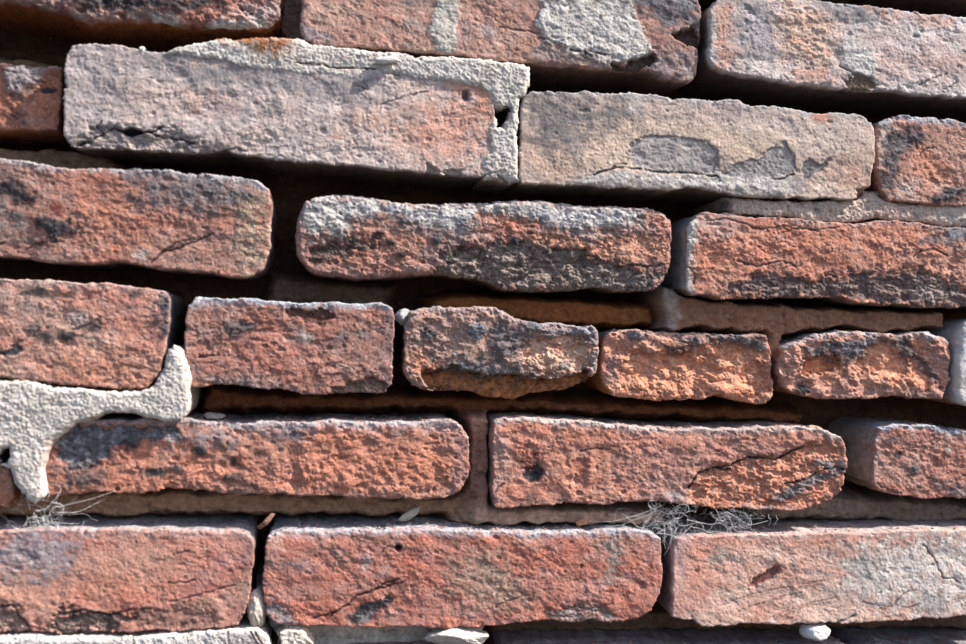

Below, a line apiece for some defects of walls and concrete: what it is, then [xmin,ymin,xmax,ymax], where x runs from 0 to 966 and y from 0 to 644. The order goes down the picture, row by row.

crack [77,121,195,147]
peeling [627,135,830,198]
crack [313,579,406,619]